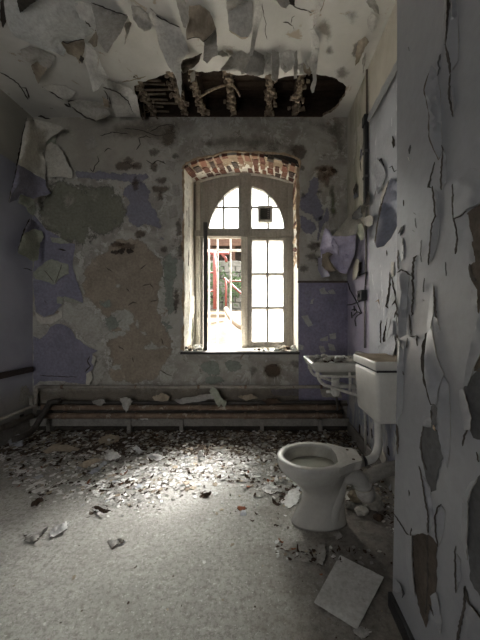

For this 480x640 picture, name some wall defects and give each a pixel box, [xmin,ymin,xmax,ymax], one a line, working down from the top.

peeling [0,0,320,121]
peeling [9,115,73,208]
leakage [111,241,134,255]
flaking render [82,238,173,384]
crack [90,124,175,172]
peeling [318,122,404,280]
peeling [376,255,417,356]
peeling [427,162,440,265]
crack [439,145,447,190]
peeling [451,168,480,446]
peeling [393,284,451,633]
peeling [456,475,480,640]